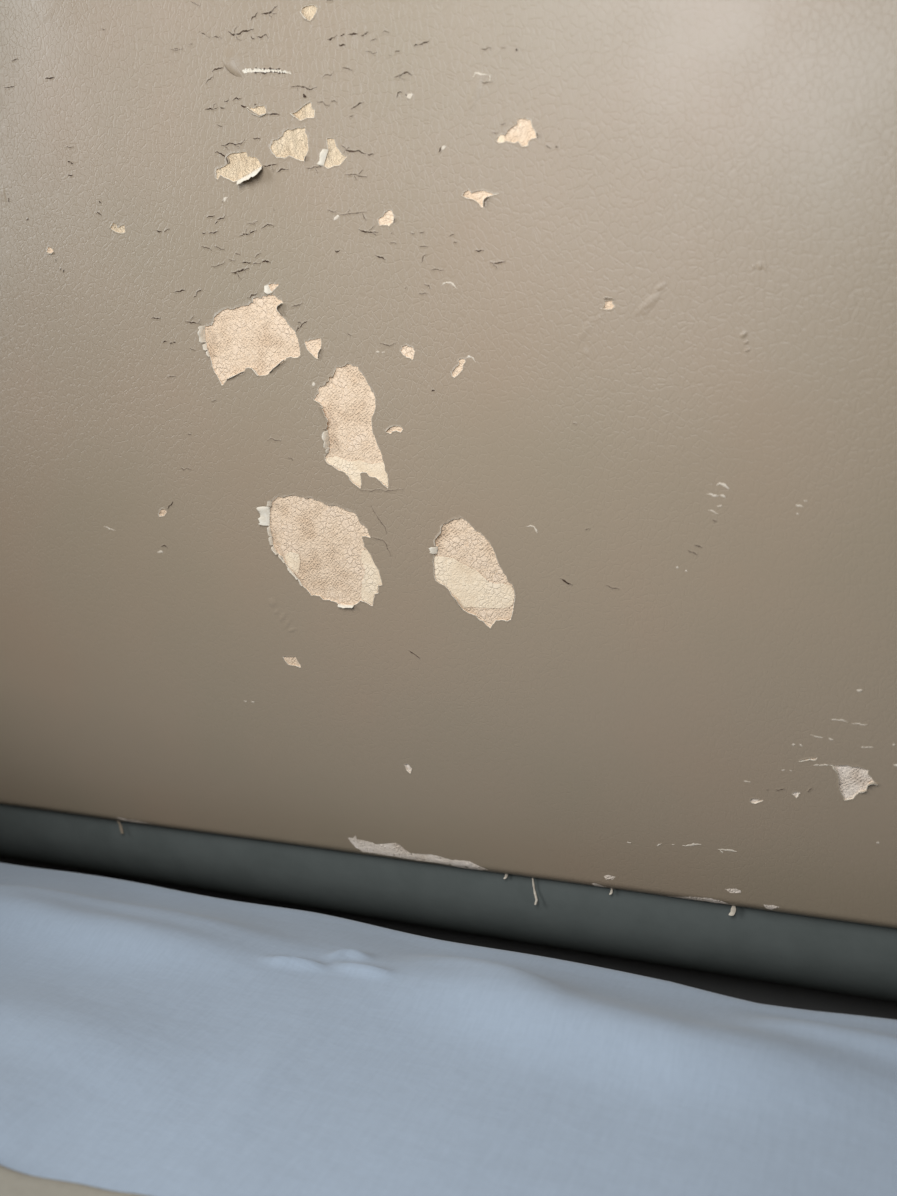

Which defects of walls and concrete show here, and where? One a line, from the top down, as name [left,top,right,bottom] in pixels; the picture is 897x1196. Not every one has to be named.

crack [170,0,430,180]
crack [480,45,506,86]
peeling [214,100,348,202]
crack [151,199,275,352]
peeling [198,282,323,387]
crack [291,302,308,333]
crack [327,208,505,296]
peeling [312,361,404,490]
peeling [256,493,384,608]
peeling [429,515,517,630]
peeling [782,735,880,802]
peeling [348,836,488,870]